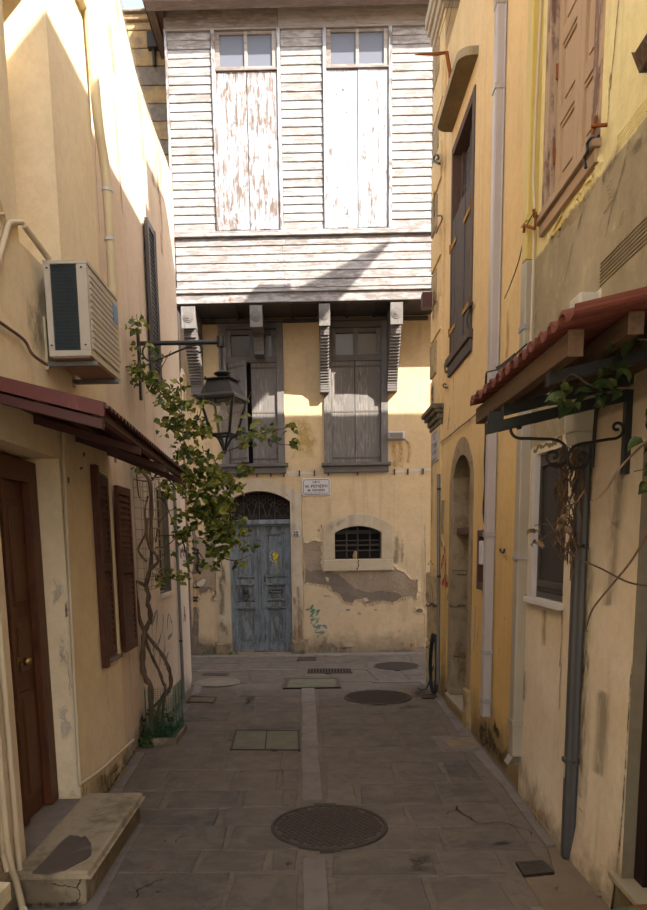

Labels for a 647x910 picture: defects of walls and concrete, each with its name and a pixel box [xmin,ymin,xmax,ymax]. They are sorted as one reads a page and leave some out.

flaking render [189,522,217,655]
flaking render [302,525,429,616]
damp [479,722,506,762]